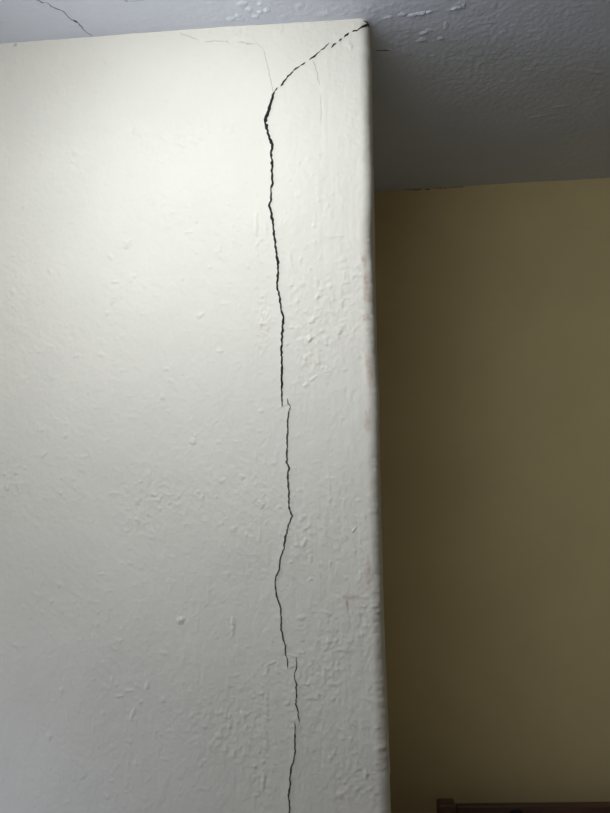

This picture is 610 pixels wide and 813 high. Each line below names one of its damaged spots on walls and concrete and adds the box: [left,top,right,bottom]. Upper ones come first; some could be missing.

crack [37,0,92,36]
crack [181,21,369,813]